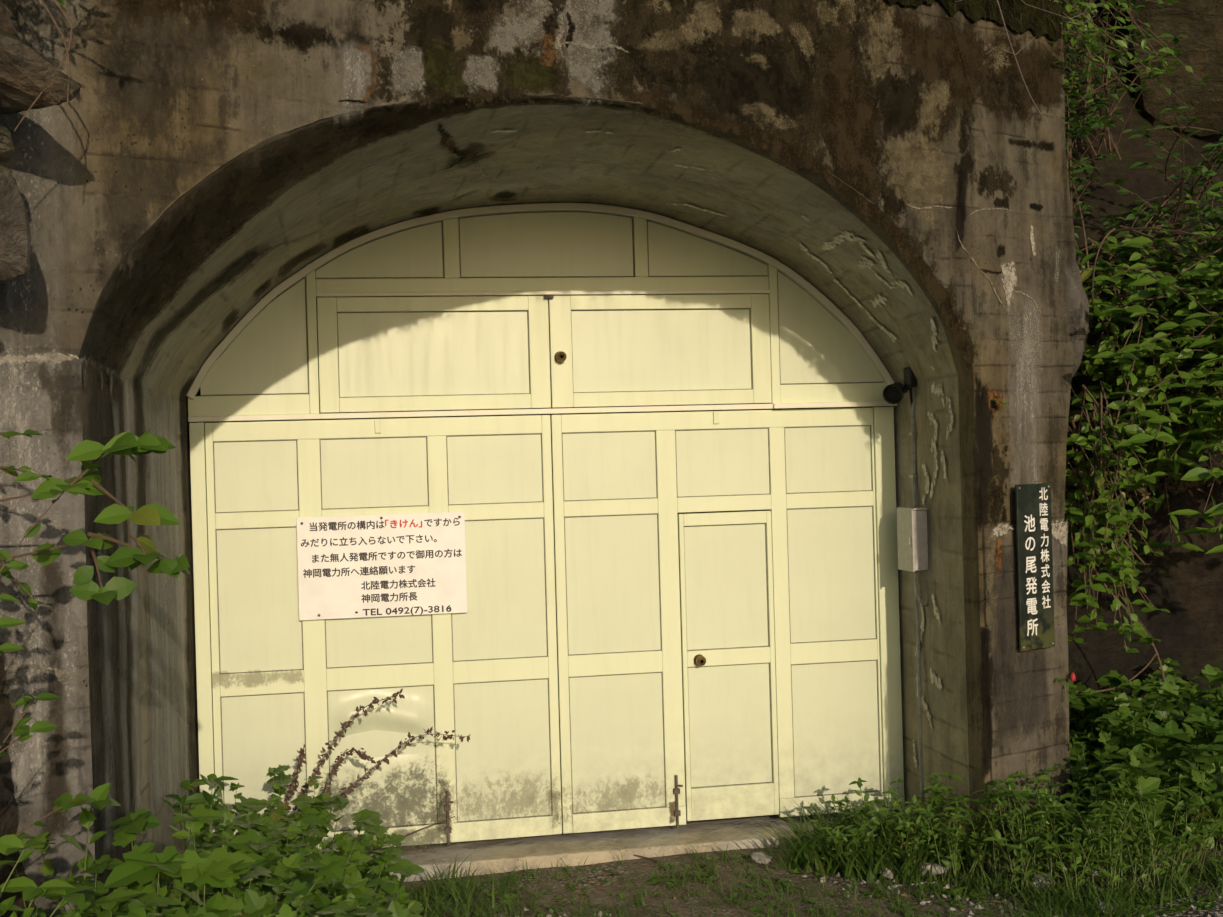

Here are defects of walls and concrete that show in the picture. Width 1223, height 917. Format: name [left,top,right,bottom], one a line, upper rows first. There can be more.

crack [540,0,629,66]
crack [437,124,497,186]
damp [0,0,1064,835]
rust [987,390,1002,414]
damp [1052,520,1068,545]